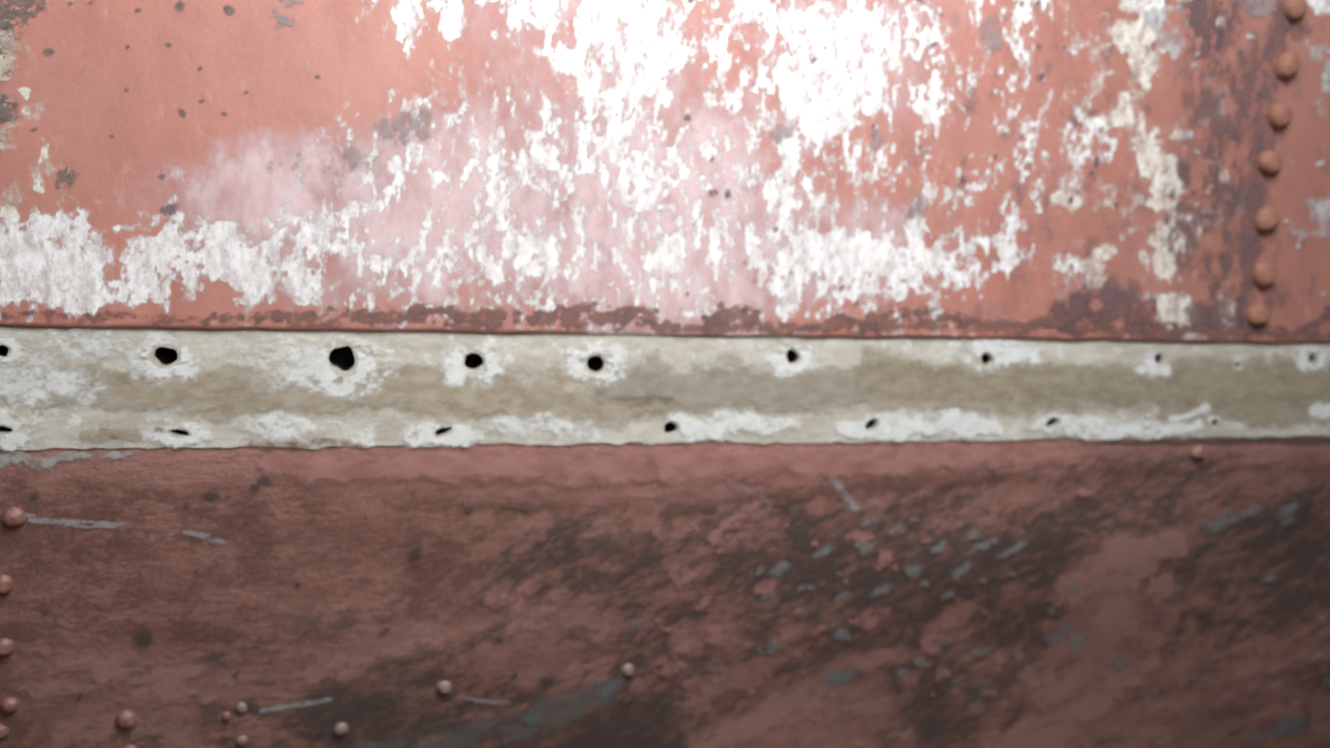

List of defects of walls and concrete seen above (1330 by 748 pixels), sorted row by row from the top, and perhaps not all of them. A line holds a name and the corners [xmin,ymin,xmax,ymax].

peeling [1307,0,1330,29]
corrosion [0,31,17,81]
leakage [555,0,645,92]
peeling [1311,47,1330,103]
peeling [0,0,1229,339]
leakage [186,86,822,335]
leakage [847,203,905,287]
peeling [1285,199,1330,249]
corrosion [1,309,68,321]
corrosion [85,301,1330,342]
leakage [1053,279,1156,330]
corrosion [0,480,283,672]